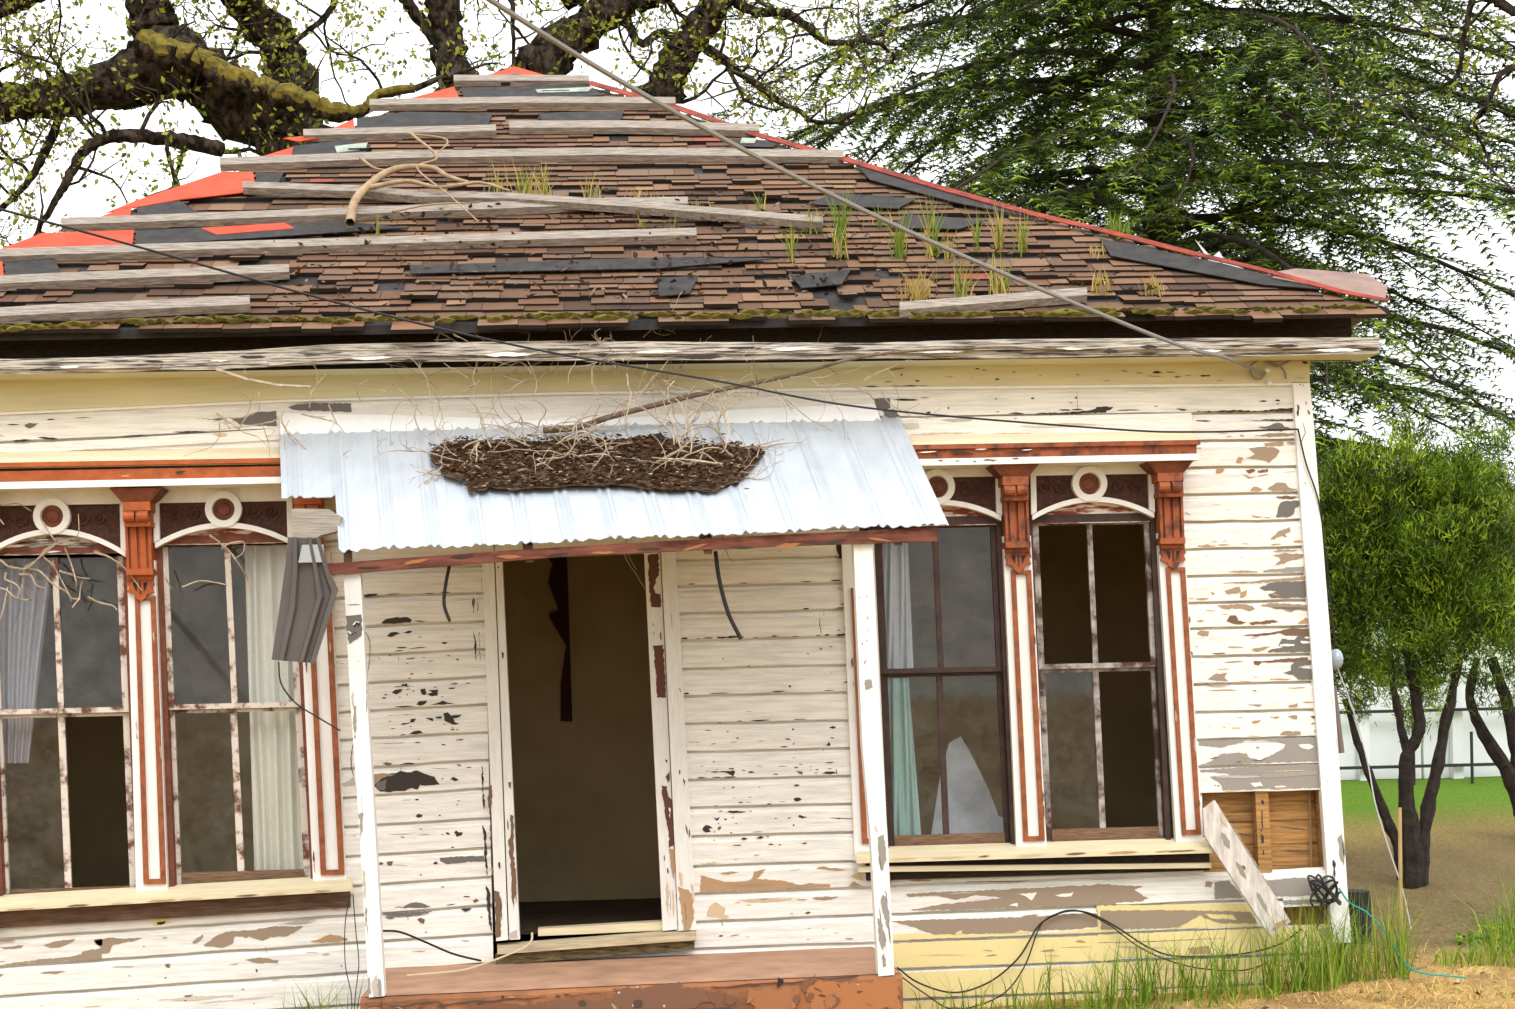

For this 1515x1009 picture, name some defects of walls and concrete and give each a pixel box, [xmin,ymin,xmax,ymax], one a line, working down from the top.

peeling [176,403,352,437]
peeling [352,348,618,362]
peeling [1177,344,1359,499]
peeling [346,593,399,644]
peeling [334,617,481,802]
peeling [648,554,689,698]
peeling [1188,515,1333,804]
peeling [0,937,145,977]
peeling [204,920,348,981]
peeling [362,782,518,939]
peeling [662,711,863,940]
peeling [878,815,1345,970]